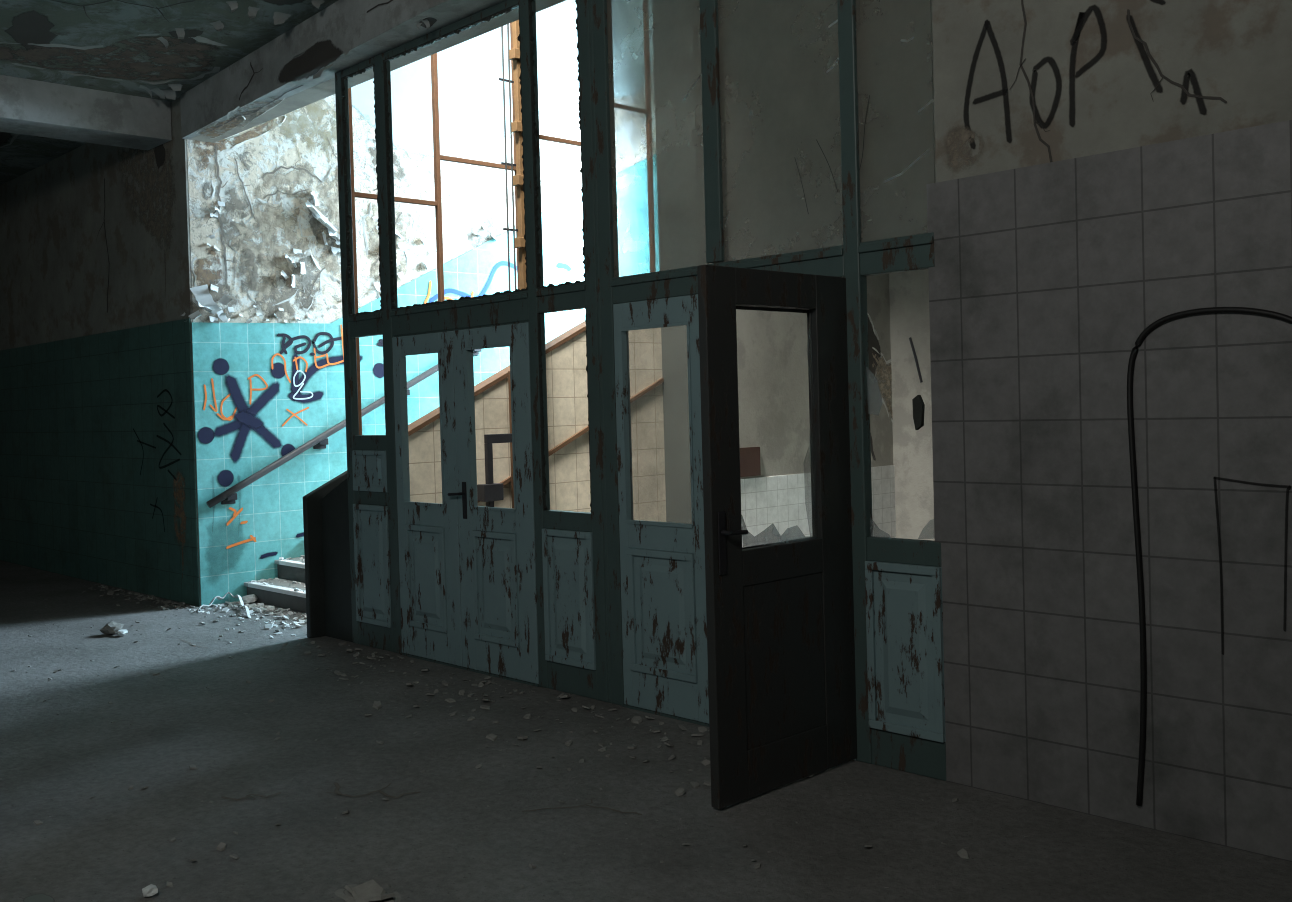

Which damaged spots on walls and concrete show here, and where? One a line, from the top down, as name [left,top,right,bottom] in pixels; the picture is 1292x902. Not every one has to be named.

spalling [5,10,58,50]
spalling [181,37,349,324]
spalling [355,200,381,298]
spalling [394,194,436,289]